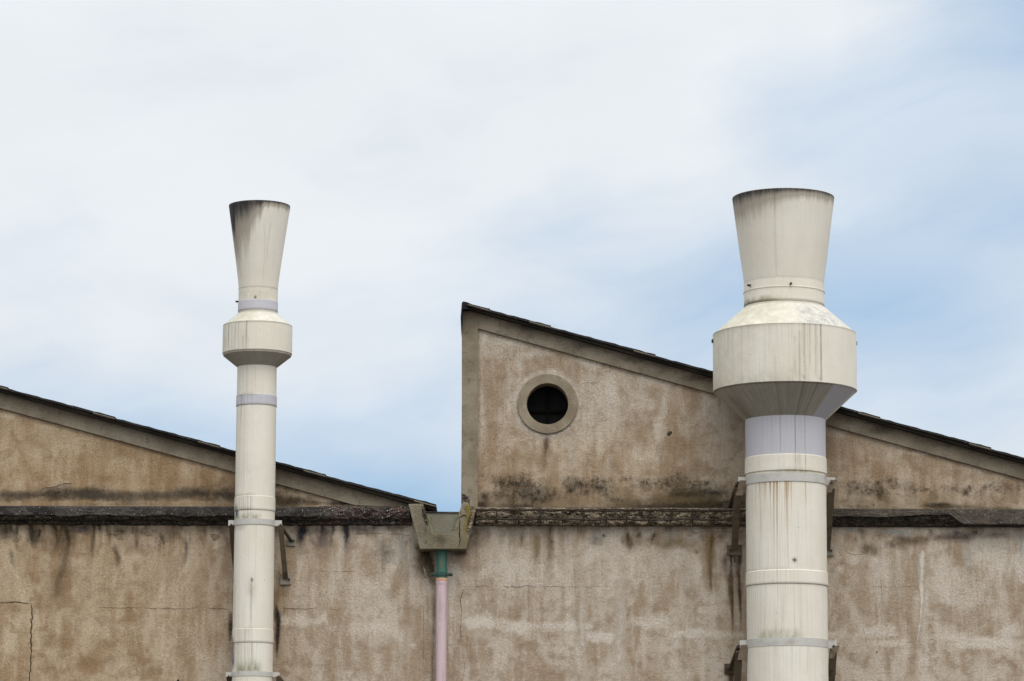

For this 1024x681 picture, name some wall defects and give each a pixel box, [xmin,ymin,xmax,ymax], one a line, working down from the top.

crack [1,601,33,681]